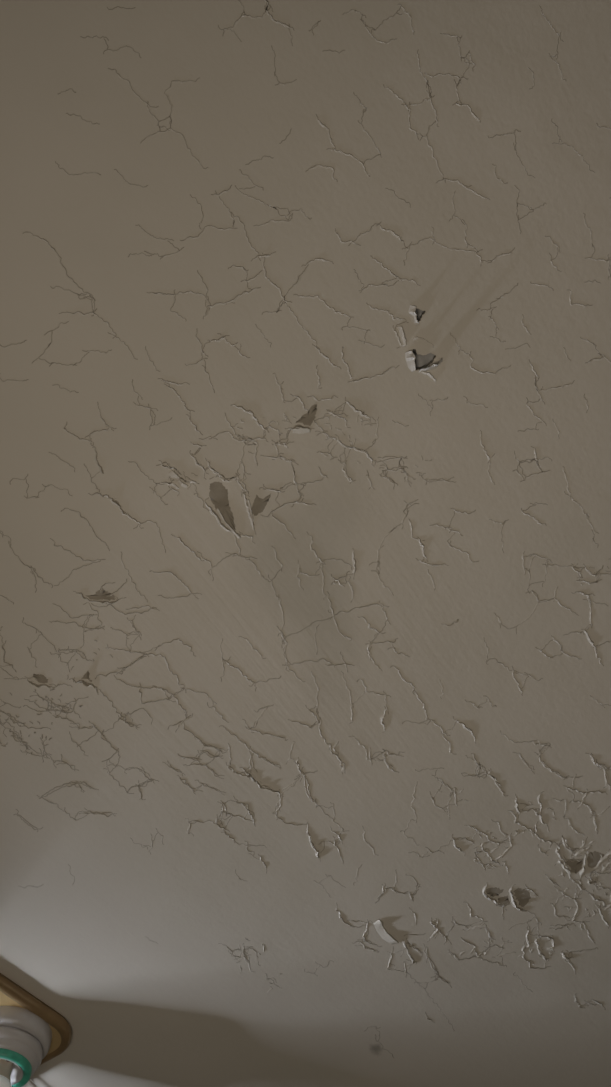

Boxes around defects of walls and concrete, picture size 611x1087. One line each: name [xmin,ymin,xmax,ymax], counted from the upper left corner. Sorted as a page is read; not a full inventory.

crack [80,35,208,169]
crack [218,0,611,548]
spalling [128,365,379,603]
crack [0,224,611,1032]
peeling [336,903,398,953]
spalling [408,768,611,975]